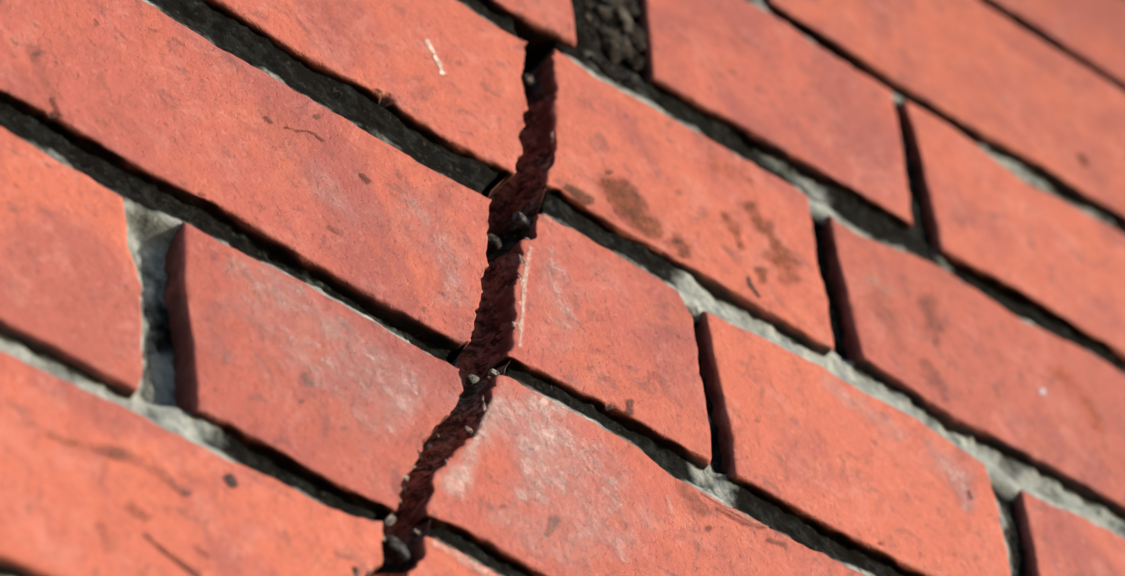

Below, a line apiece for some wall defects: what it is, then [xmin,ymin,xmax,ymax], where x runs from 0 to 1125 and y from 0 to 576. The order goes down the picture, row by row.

crack [352,59,553,576]